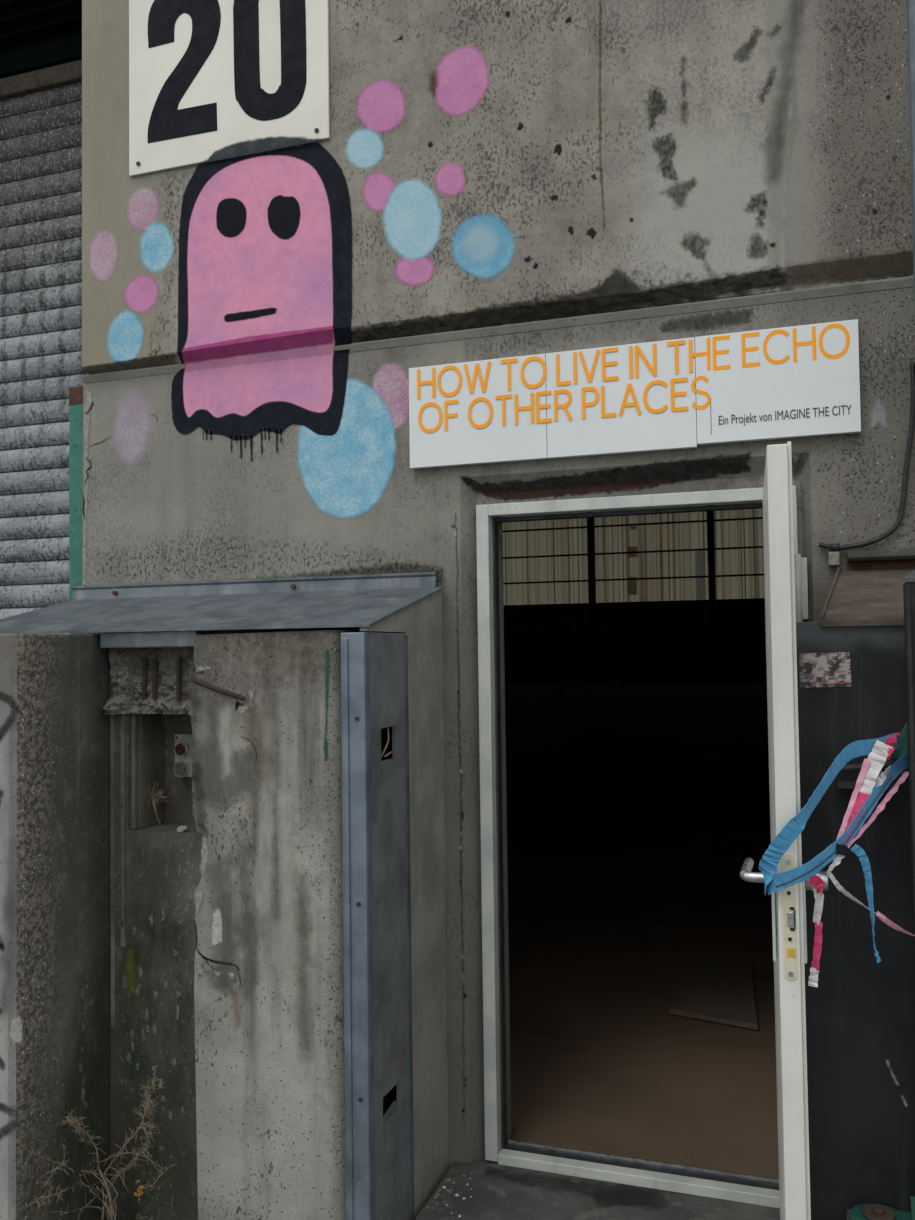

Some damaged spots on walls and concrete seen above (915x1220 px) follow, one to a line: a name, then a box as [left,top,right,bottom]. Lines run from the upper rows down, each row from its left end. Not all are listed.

damp [739,25,780,61]
damp [648,88,695,205]
damp [351,193,913,343]
spalling [142,657,158,700]
damp [199,707,251,806]
damp [217,791,305,988]